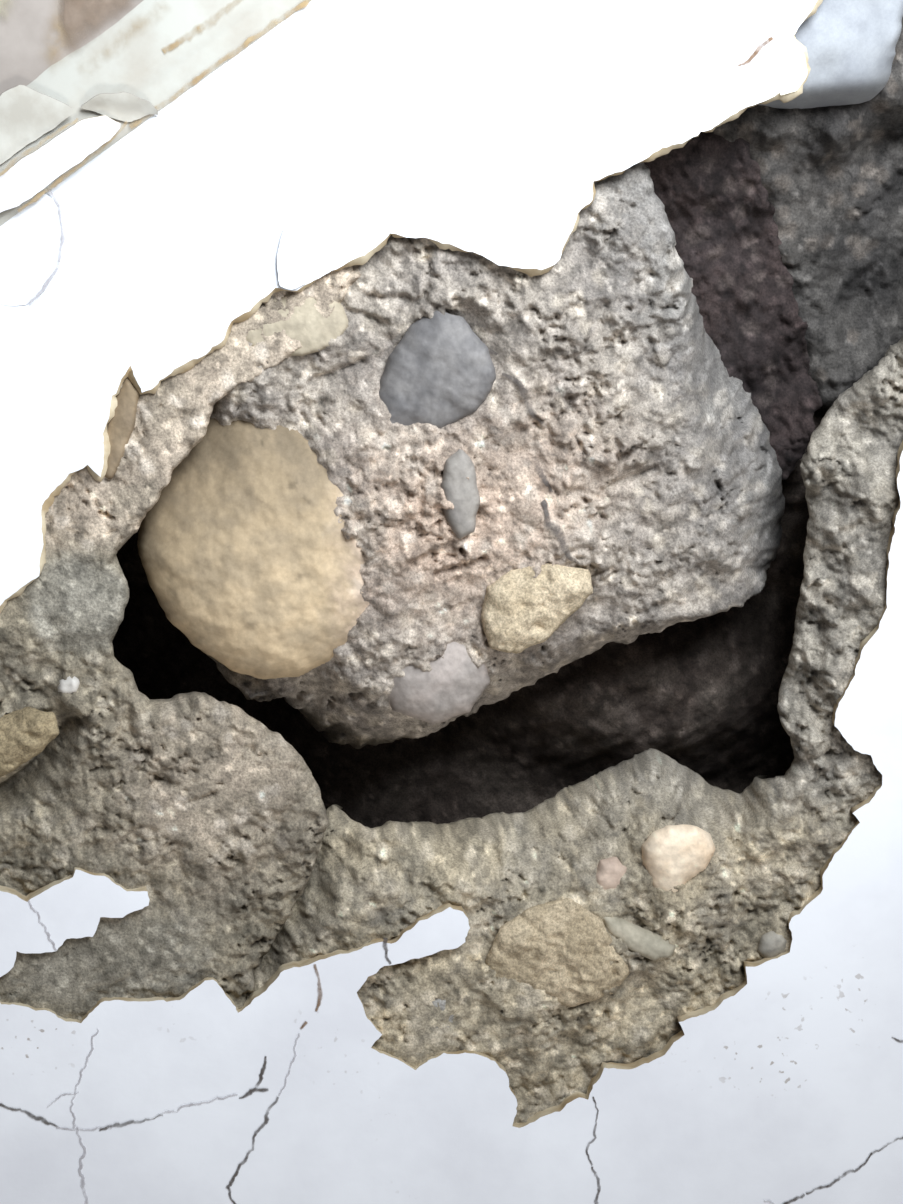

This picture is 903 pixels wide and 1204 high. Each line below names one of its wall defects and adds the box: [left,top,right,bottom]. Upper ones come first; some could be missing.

peeling [62,0,129,41]
peeling [0,84,158,306]
spalling [254,0,903,1123]
crack [28,901,57,951]
crack [383,938,391,964]
crack [0,964,322,1204]
crack [586,1097,600,1204]
crack [764,1137,903,1204]